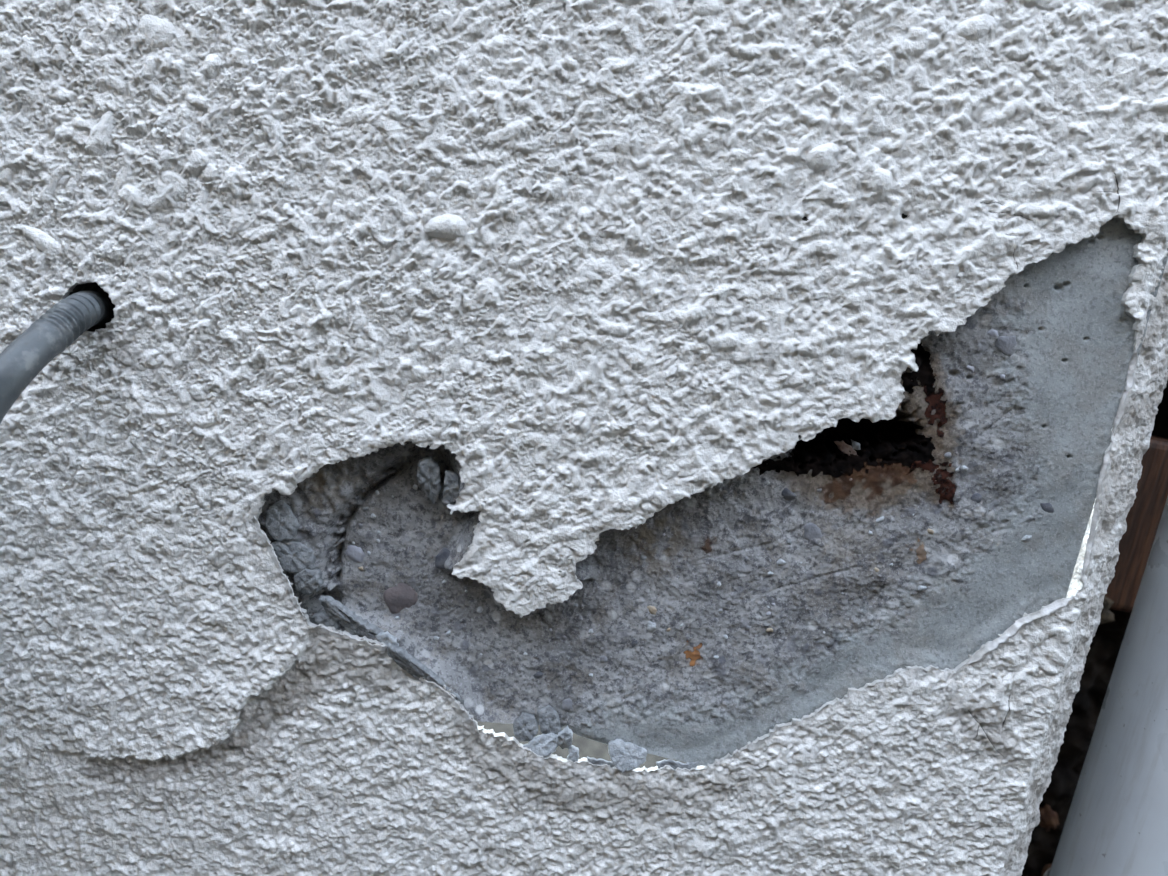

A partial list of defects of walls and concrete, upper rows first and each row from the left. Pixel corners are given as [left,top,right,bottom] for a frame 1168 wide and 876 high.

spalling [253,218,1168,774]
corrosion [752,342,957,506]